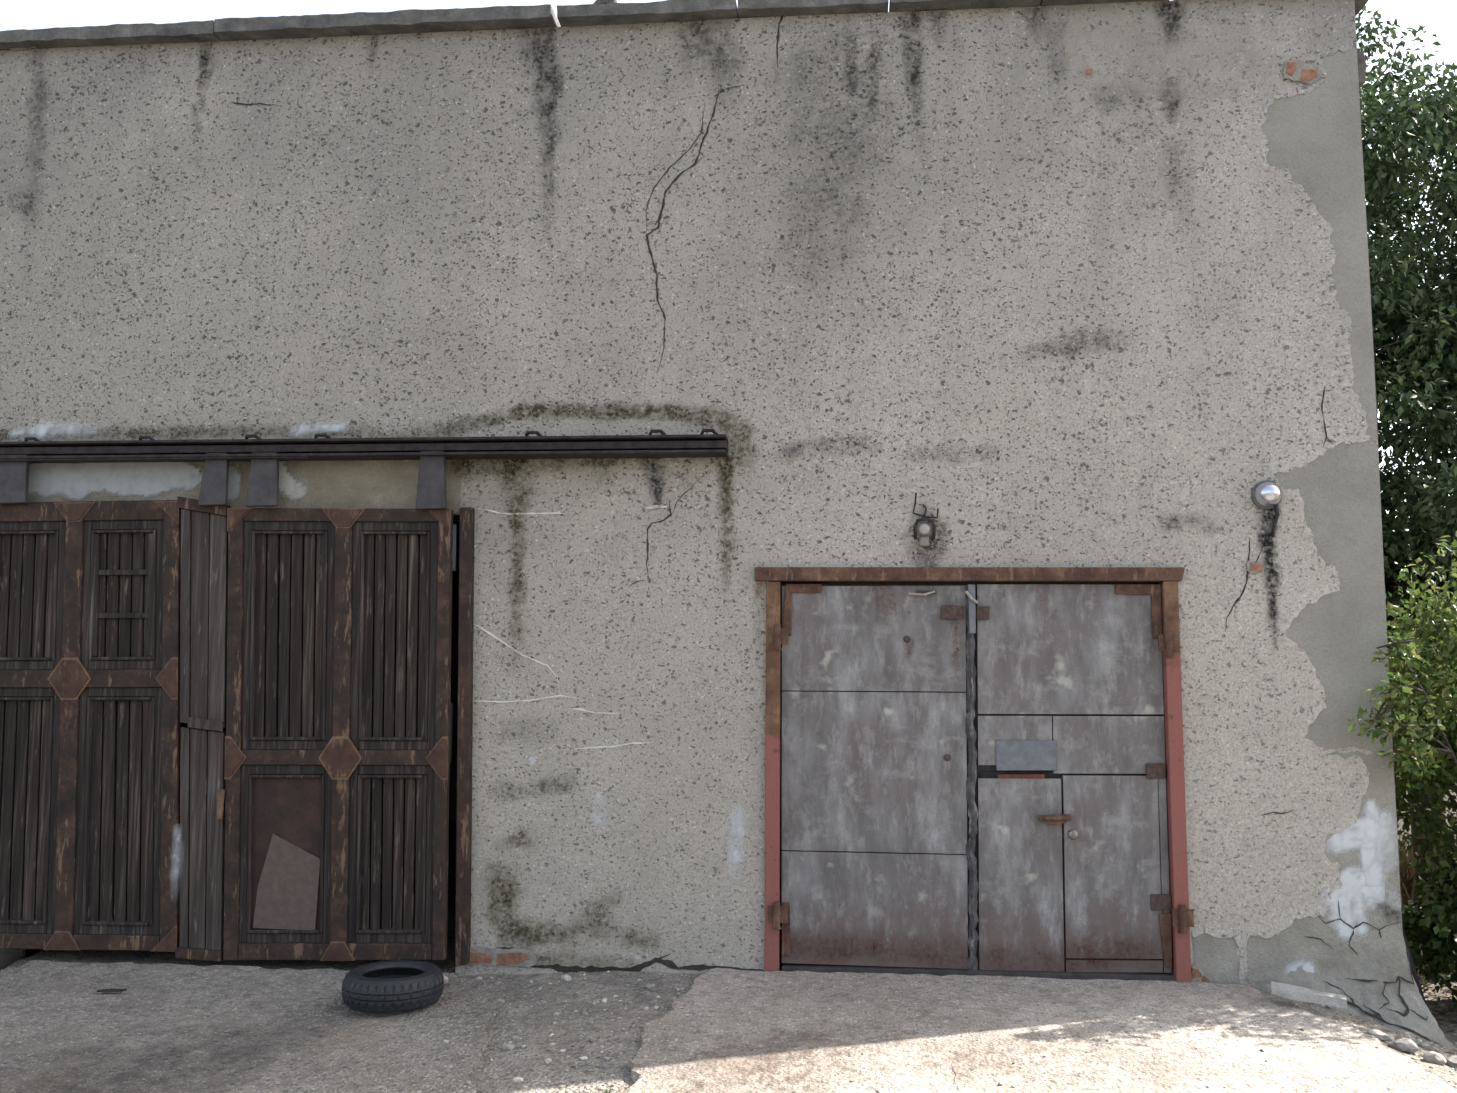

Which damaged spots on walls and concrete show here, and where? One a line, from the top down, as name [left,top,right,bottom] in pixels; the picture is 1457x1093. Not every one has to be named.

water stain [533,29,561,160]
crack [776,15,784,68]
water stain [909,14,921,104]
crack [646,85,743,372]
water stain [1258,508,1279,632]
flaking render [1191,42,1402,984]
water stain [1326,811,1395,940]
crack [1304,902,1443,1046]